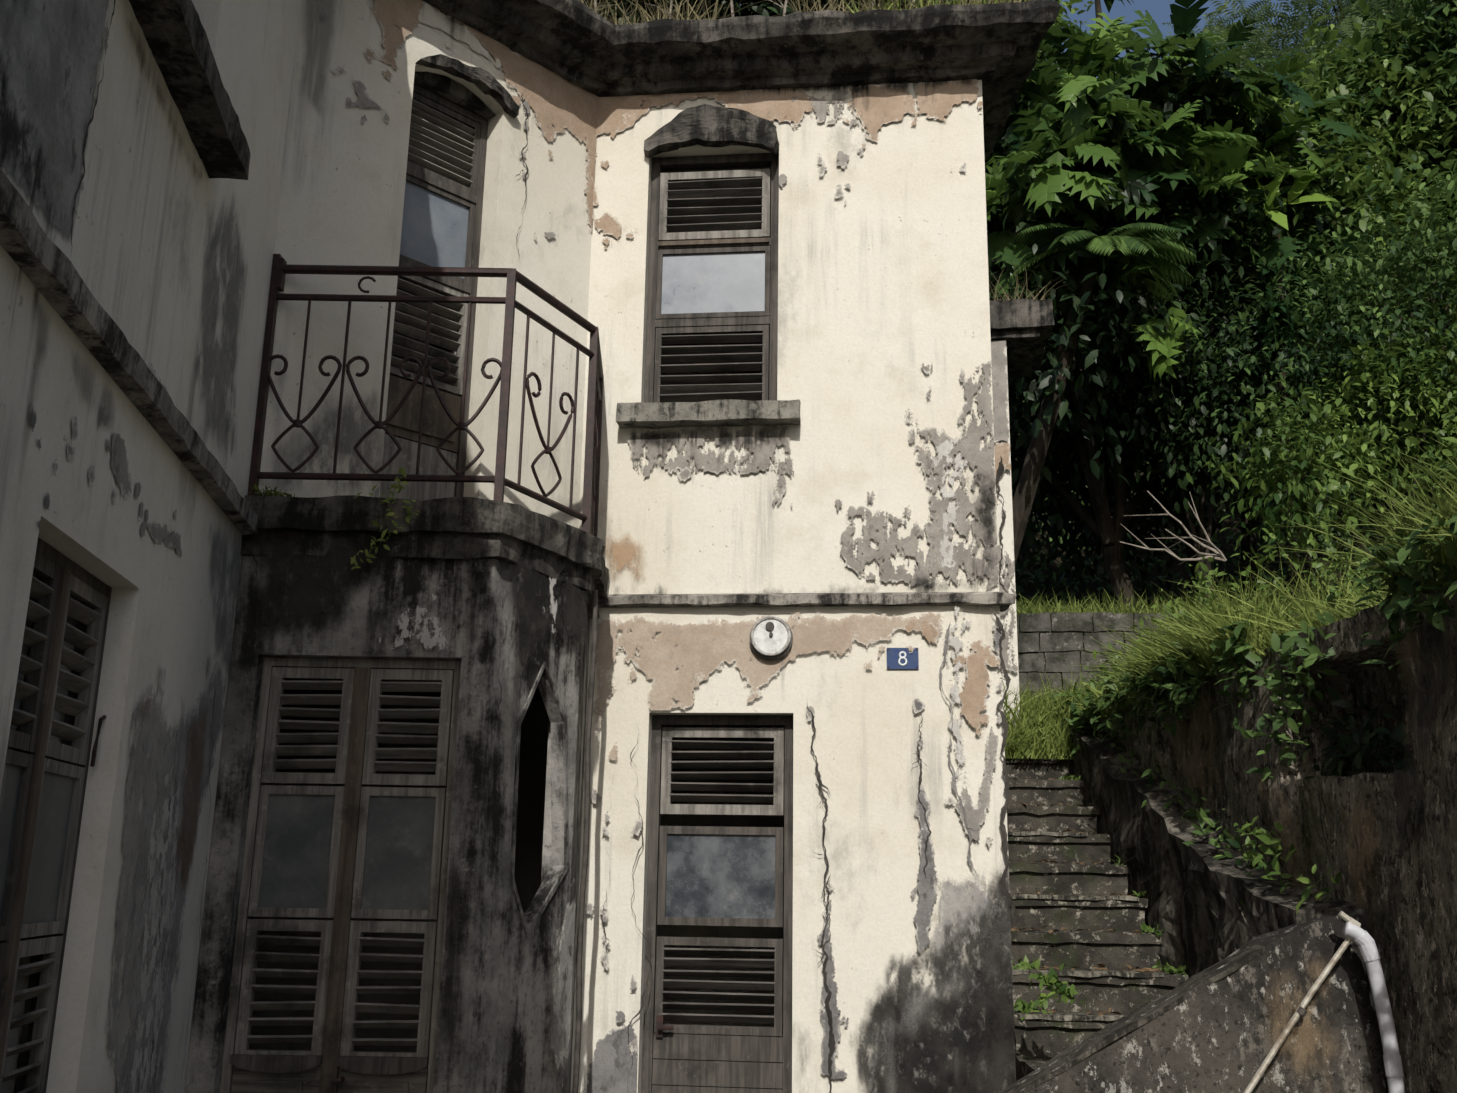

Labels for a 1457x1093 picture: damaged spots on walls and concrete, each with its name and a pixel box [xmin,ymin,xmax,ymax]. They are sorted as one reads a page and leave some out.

damp [0,0,109,238]
crack [516,94,530,257]
peeling [363,0,983,249]
damp [199,209,244,440]
spalling [88,406,182,557]
peeling [379,586,448,650]
damp [511,555,589,666]
peeling [593,340,1019,988]
crack [910,457,1016,926]
spalling [585,1011,638,1093]
crack [806,704,835,1093]
damp [858,870,1016,1093]